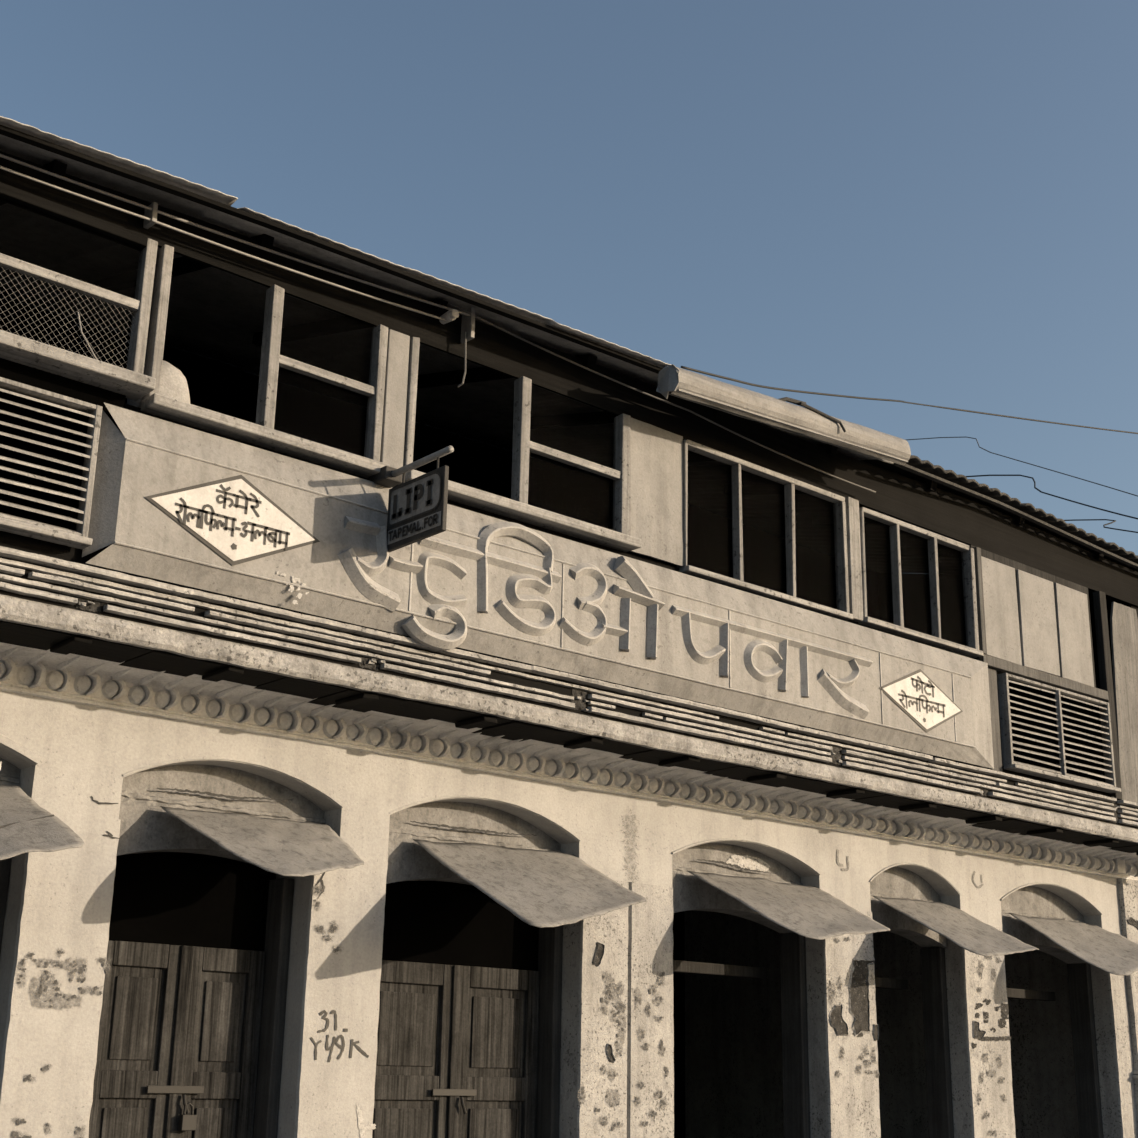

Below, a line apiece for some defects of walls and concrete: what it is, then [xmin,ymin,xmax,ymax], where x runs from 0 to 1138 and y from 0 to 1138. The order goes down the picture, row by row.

peeling [17,949,110,1009]
peeling [578,942,669,1131]
spalling [827,958,880,1078]
spalling [972,956,1011,1137]
peeling [11,1118,32,1138]